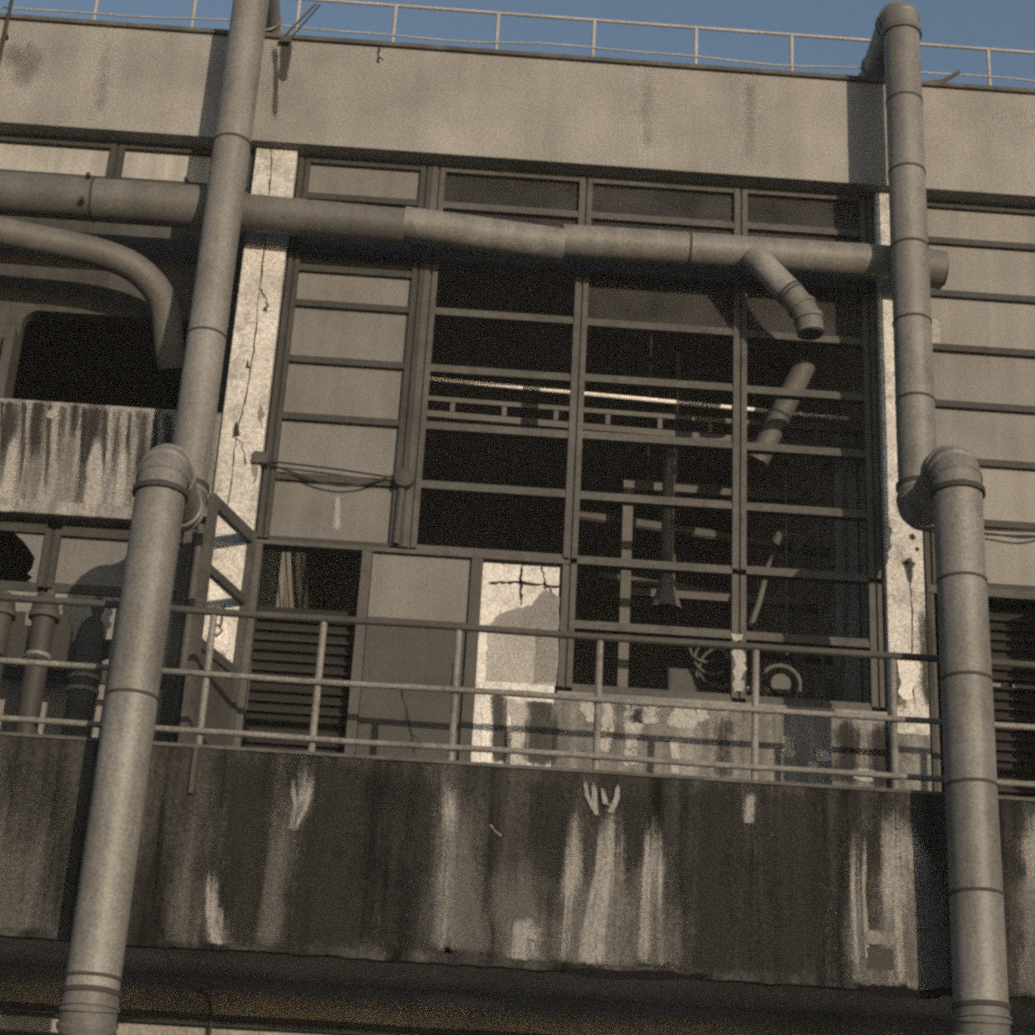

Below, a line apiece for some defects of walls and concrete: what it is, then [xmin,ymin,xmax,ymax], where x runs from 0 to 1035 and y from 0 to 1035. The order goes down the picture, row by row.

water stain [0,401,173,511]
water stain [491,689,559,766]
water stain [716,721,732,775]
water stain [834,722,889,787]
peeling [897,660,920,701]
water stain [206,761,823,972]
water stain [848,827,947,990]
efflorescence [1018,820,1035,993]